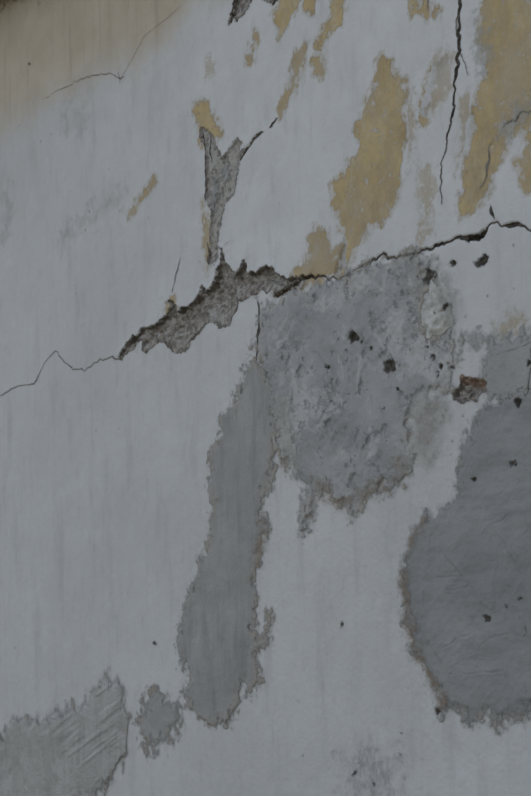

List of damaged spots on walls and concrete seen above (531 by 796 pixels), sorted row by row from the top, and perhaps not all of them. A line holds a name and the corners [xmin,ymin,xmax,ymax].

crack [439,0,468,204]
peeling [458,0,531,217]
peeling [119,0,408,361]
crack [479,110,531,189]
crack [300,205,531,281]
spalling [417,269,437,284]
crack [0,350,120,396]
crack [254,300,262,358]
spalling [384,359,396,373]
spalling [425,345,487,404]